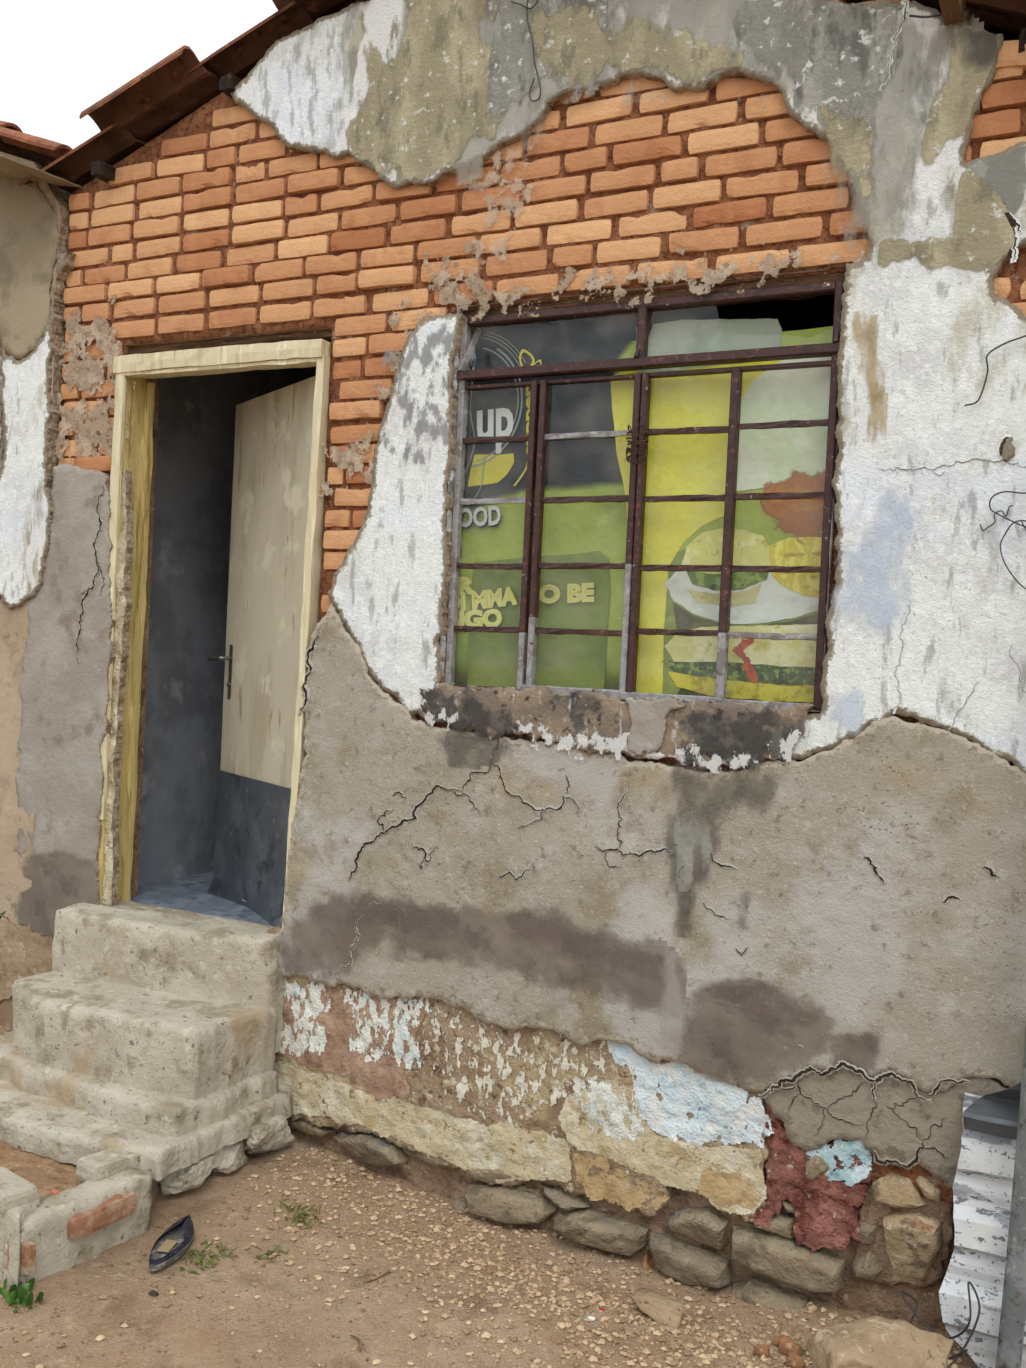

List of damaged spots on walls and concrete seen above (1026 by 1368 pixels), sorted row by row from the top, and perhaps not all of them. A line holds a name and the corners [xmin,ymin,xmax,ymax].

flaking render [54,77,870,612]
crack [334,734,582,975]
damp [416,688,635,769]
damp [282,707,877,1082]
crack [594,783,738,871]
crack [702,901,748,957]
peeling [274,977,954,1289]
crack [758,1043,1010,1189]